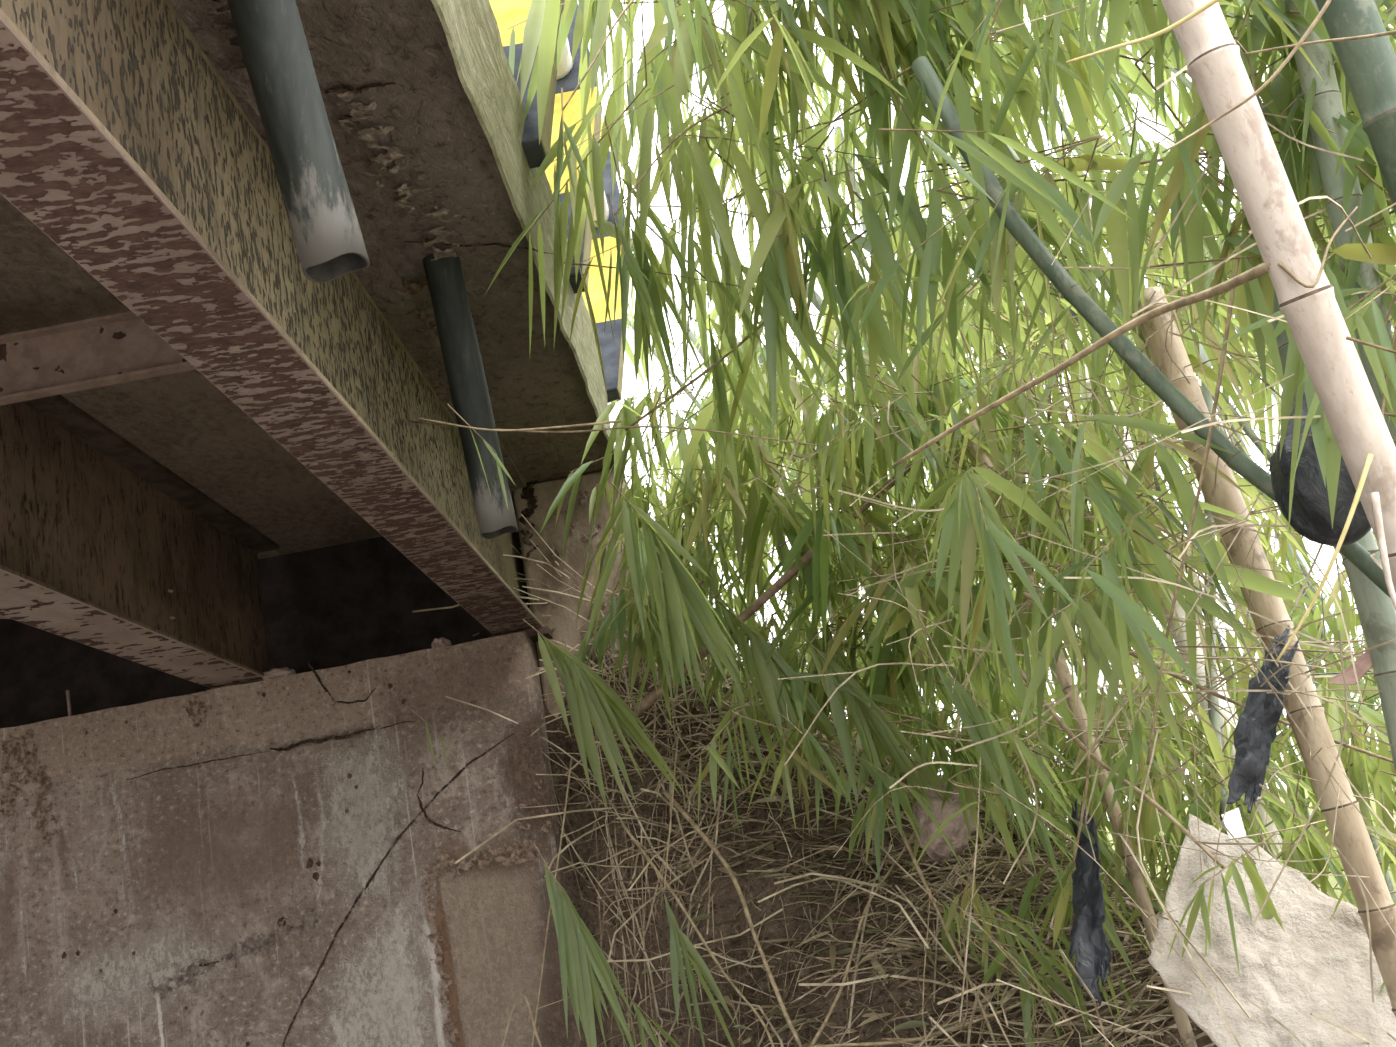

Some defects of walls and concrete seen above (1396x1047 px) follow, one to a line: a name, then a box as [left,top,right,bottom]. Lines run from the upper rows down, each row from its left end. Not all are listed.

rust [0,342,18,362]
peeling [0,0,541,635]
peeling [0,574,266,728]
crack [126,661,416,780]
crack [175,958,224,974]
crack [283,733,514,1047]